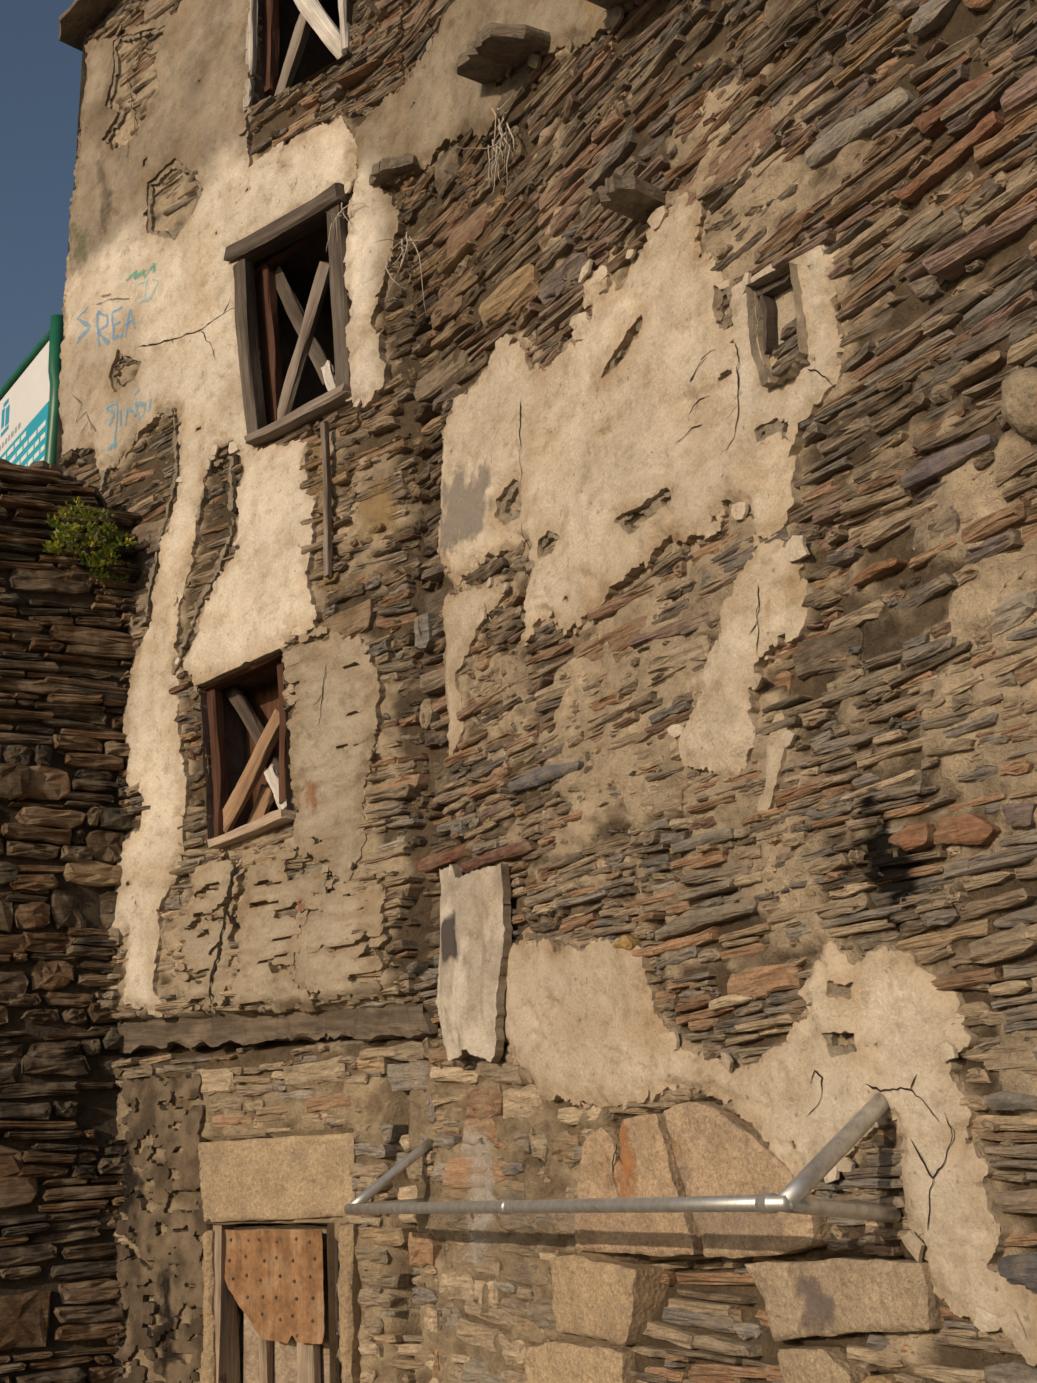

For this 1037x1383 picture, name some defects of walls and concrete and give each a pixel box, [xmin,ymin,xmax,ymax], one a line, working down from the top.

crack [136,297,235,358]
peeling [58,0,647,1018]
crack [866,1074,953,1226]